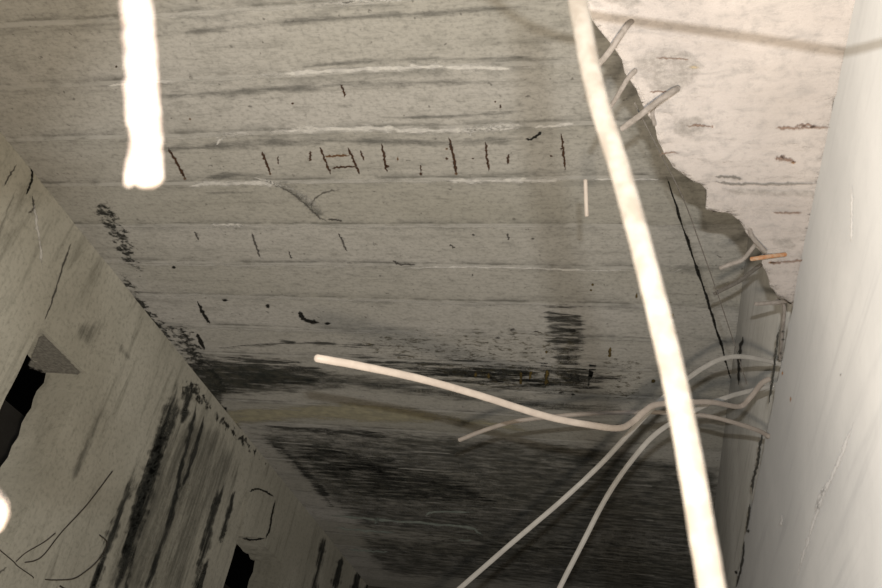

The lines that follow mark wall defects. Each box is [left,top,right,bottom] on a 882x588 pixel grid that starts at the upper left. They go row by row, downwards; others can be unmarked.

spalling [599,19,634,67]
spalling [610,68,637,109]
spalling [620,85,680,131]
rust [309,148,364,174]
crack [45,246,70,319]
leakage [96,204,363,268]
spalling [713,228,793,295]
spalling [29,335,79,375]
crack [769,330,780,402]
leakage [90,274,696,588]
crack [242,488,275,541]
crack [734,435,763,587]